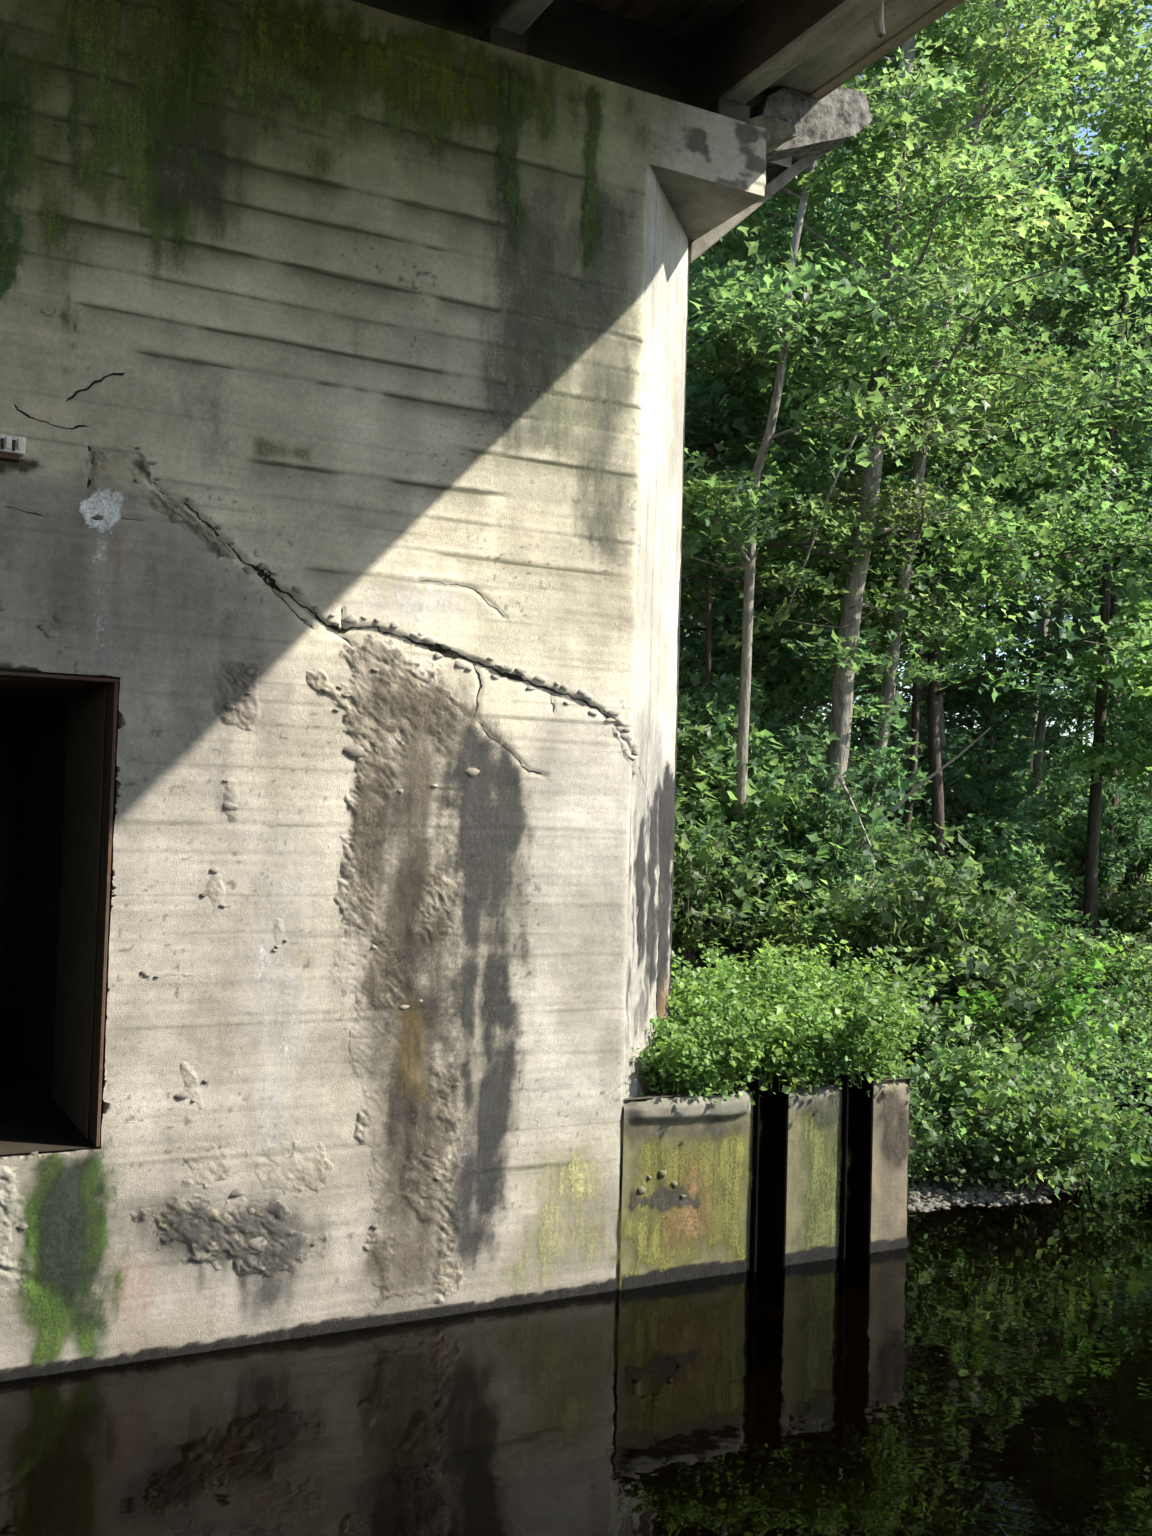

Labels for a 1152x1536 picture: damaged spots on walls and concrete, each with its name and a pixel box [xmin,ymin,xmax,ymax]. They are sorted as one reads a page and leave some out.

leakage [0,35,31,298]
leakage [246,0,634,554]
crack [13,373,125,488]
peeling [85,443,238,561]
crack [120,482,650,808]
leakage [0,671,748,1382]
spalling [130,1136,338,1281]
rust [666,1166,711,1249]
leakage [785,1246,840,1266]
leakage [871,1237,909,1253]